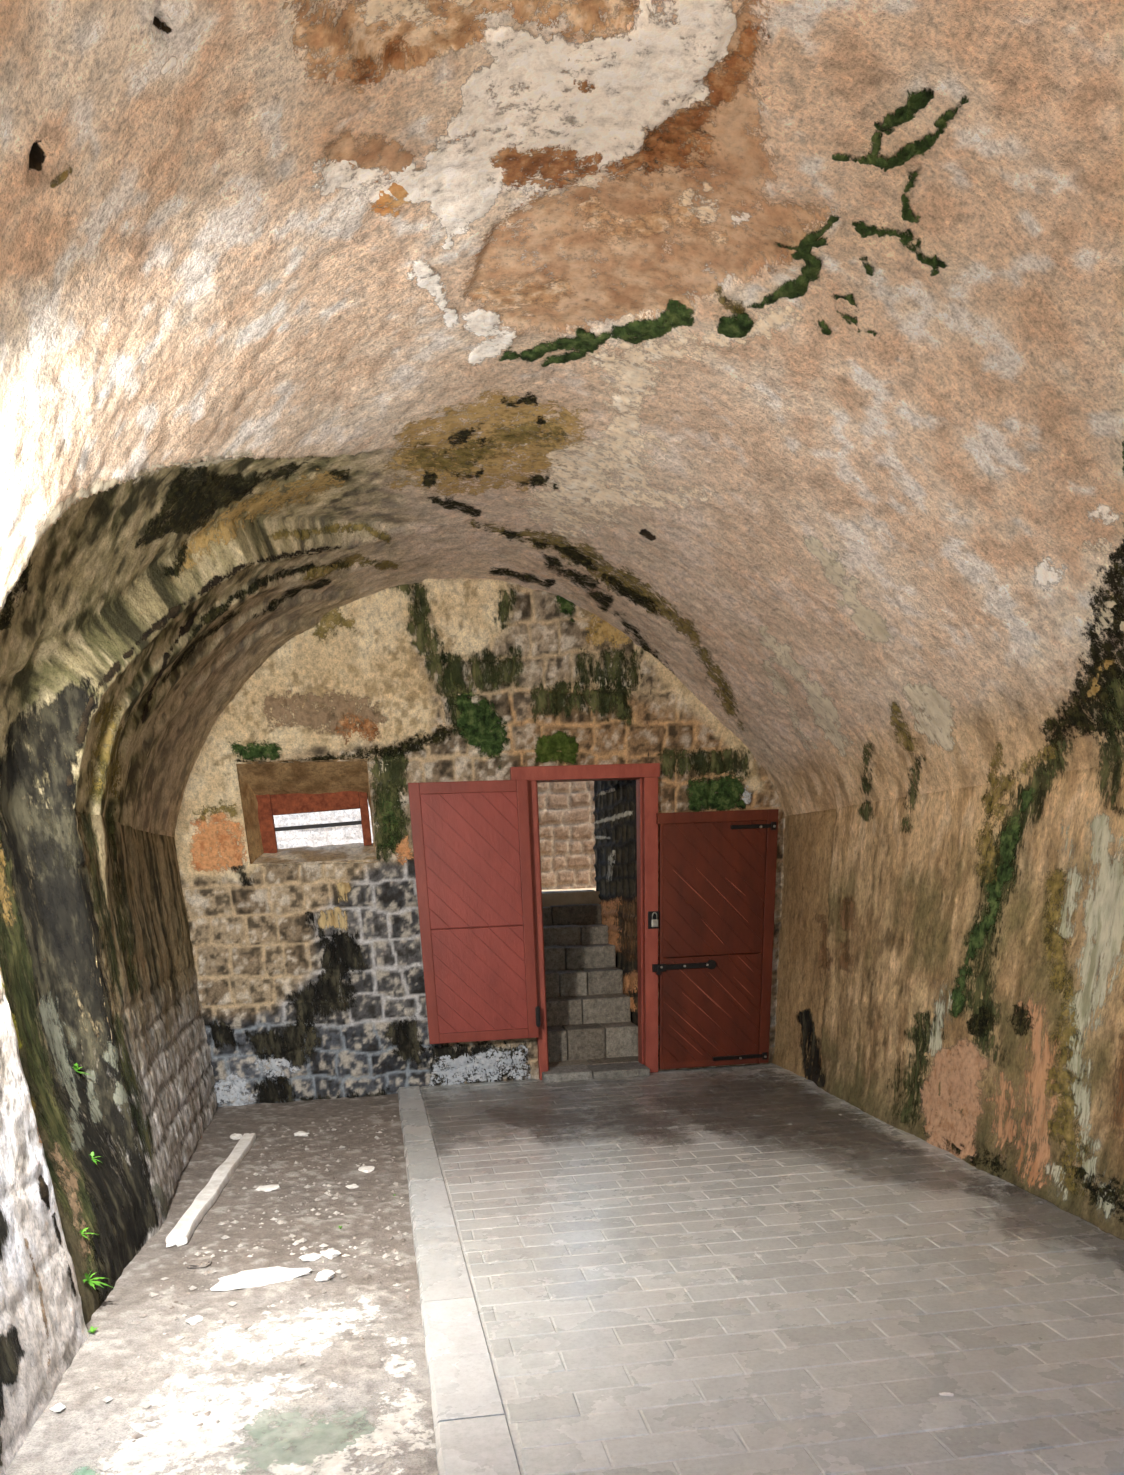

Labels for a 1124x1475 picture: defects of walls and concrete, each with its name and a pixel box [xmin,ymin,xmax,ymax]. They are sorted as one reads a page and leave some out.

peeling [283,0,835,365]
damp [0,449,254,611]
damp [0,674,171,1304]
damp [209,882,390,1106]
damp [929,986,953,1056]
damp [942,523,1124,1224]